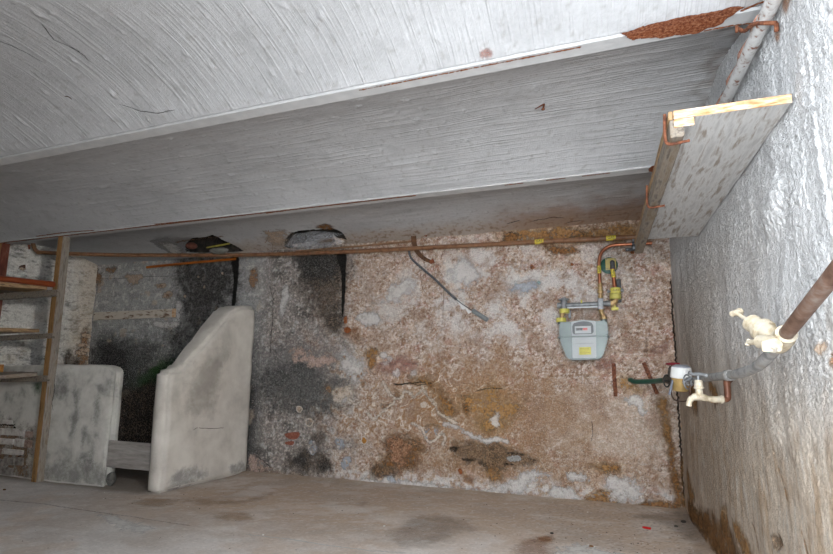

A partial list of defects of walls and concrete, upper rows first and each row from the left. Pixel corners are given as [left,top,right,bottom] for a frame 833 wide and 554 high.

corrosion [622,1,764,105]
leakage [503,224,637,256]
efflorescence [280,286,289,316]
leakage [337,254,347,317]
leakage [257,363,360,418]
leakage [341,348,379,387]
leakage [367,372,520,444]
mould [284,431,332,474]
leakage [361,422,447,488]
leakage [485,456,542,493]
leakage [550,396,695,508]